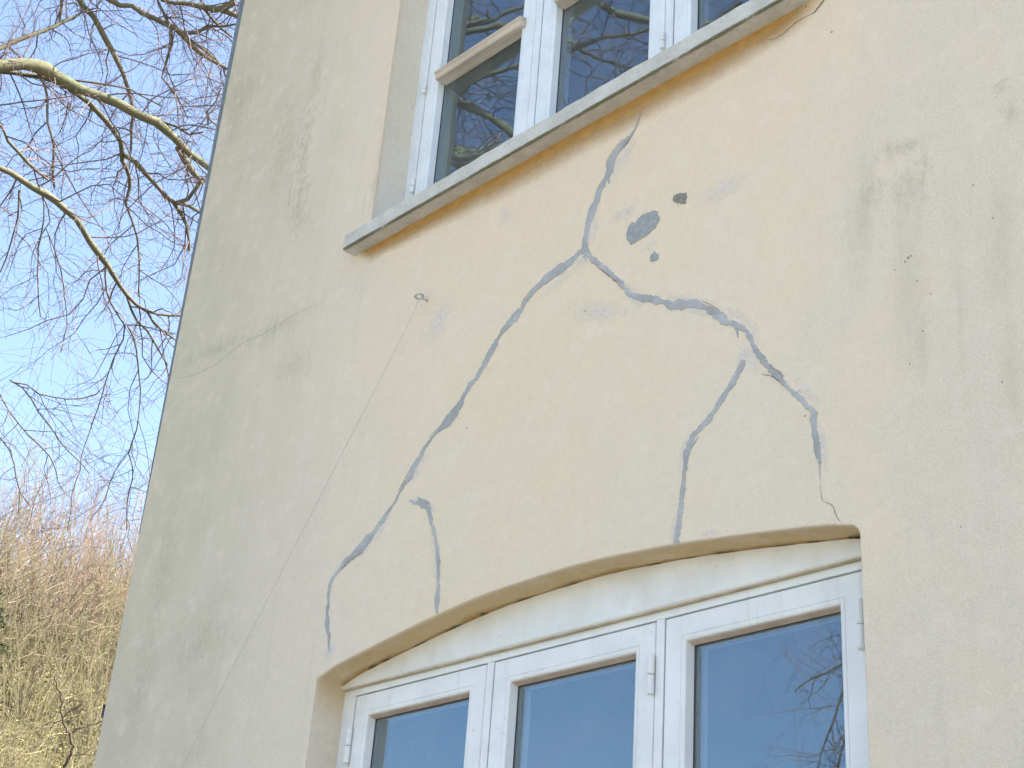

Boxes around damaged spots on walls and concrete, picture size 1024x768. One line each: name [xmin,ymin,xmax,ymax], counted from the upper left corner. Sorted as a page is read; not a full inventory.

spalling [673,192,687,204]
spalling [626,210,660,245]
crack [325,112,840,652]